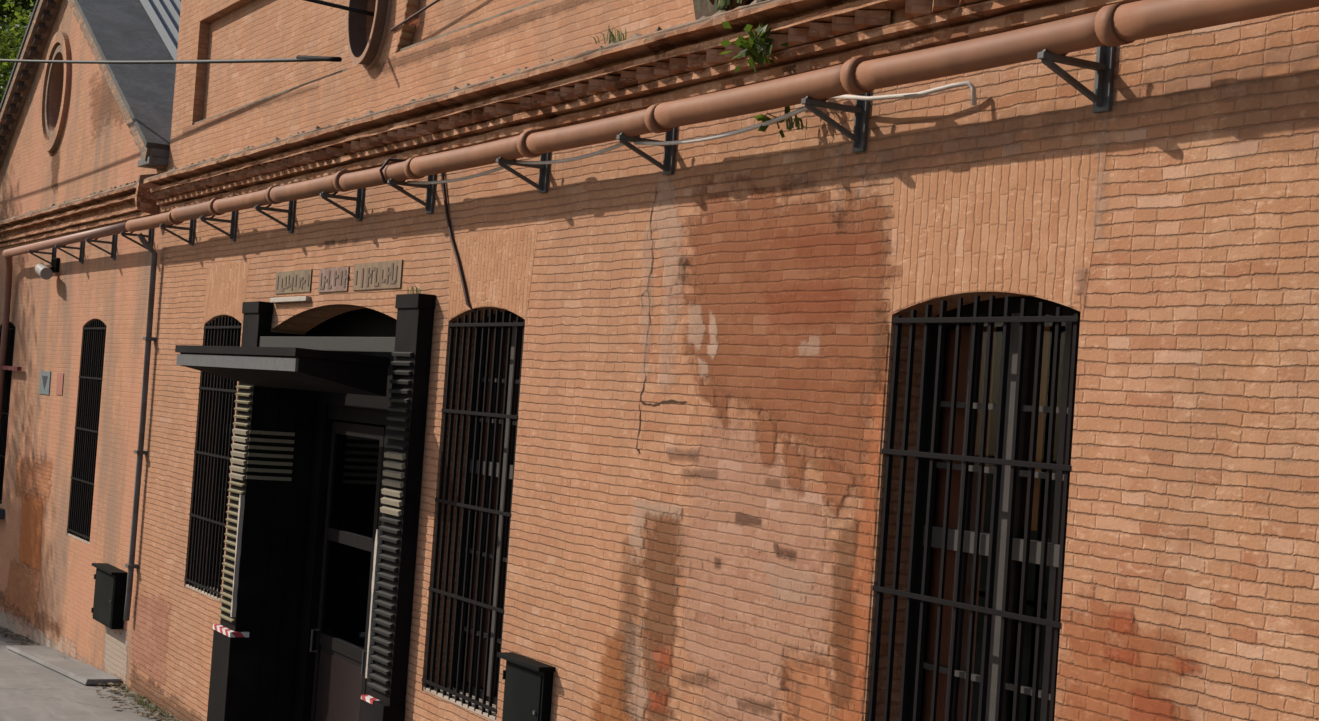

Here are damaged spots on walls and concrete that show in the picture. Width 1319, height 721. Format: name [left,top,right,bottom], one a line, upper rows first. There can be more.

crack [636,191,687,454]
peeling [679,175,900,515]